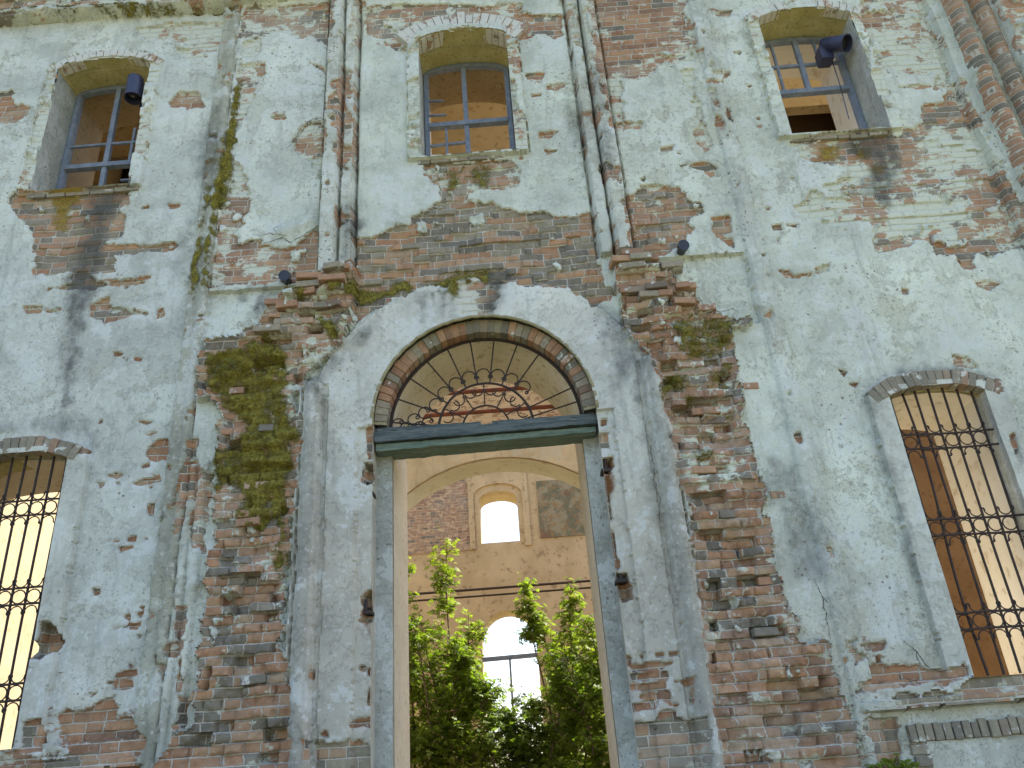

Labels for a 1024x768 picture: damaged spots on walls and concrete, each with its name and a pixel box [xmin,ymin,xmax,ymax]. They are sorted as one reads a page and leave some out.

flaking render [348,0,733,178]
flaking render [772,0,1024,291]
flaking render [8,176,178,324]
flaking render [952,353,980,369]
flaking render [146,153,972,768]
flaking render [114,534,148,553]
flaking render [0,663,147,768]